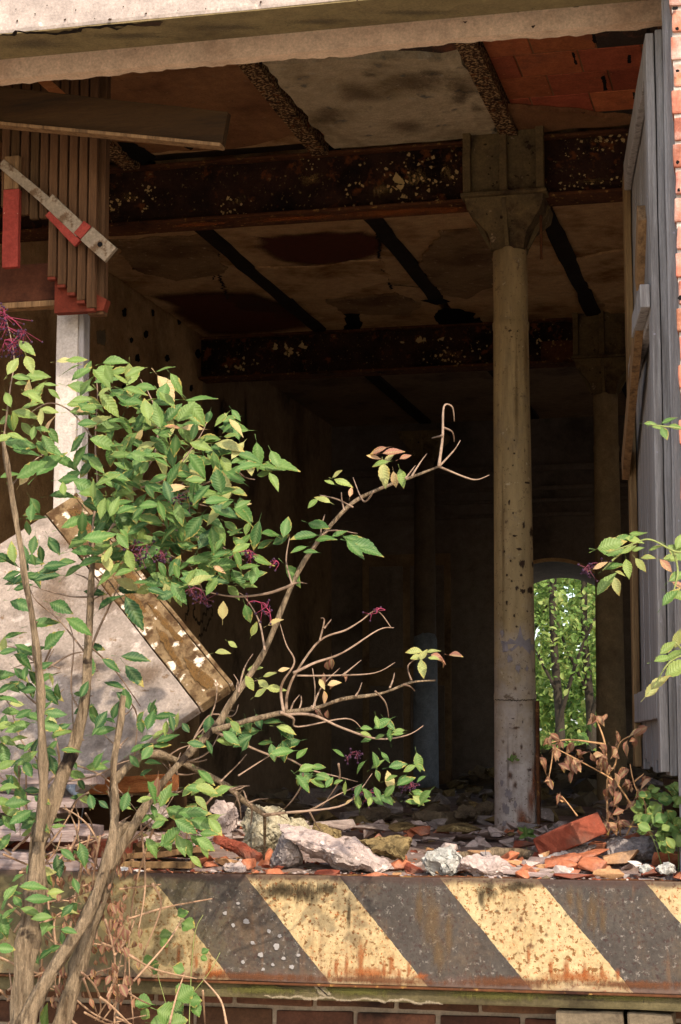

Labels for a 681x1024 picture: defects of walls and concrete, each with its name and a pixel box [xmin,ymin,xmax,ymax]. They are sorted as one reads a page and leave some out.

corrosion [193,948,445,985]
corrosion [463,963,681,989]